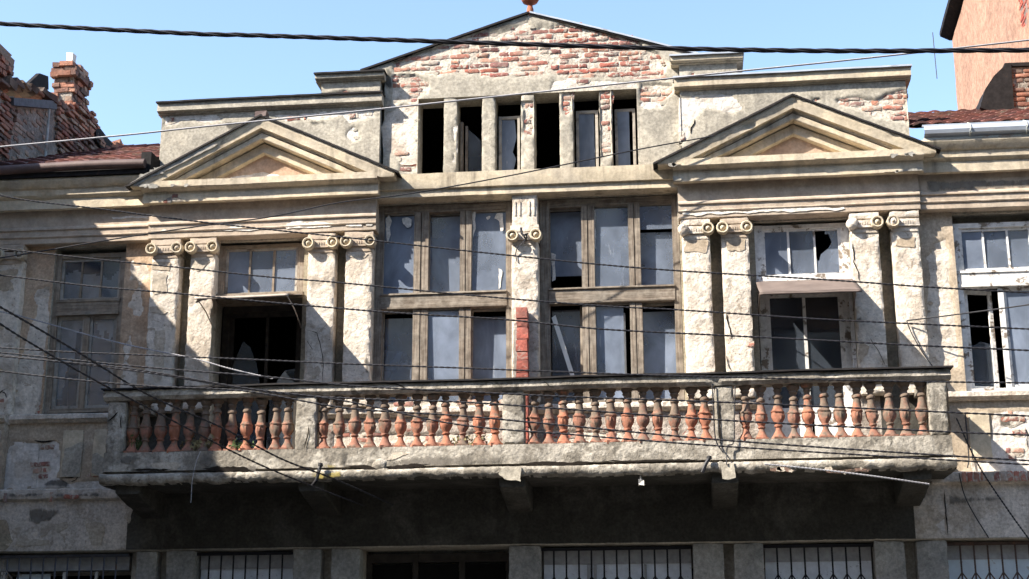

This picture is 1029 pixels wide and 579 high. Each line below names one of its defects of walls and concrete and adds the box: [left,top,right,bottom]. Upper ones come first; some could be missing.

flaking render [1018,0,1029,28]
flaking render [276,22,742,172]
flaking render [838,89,910,126]
peeling [128,261,171,316]
peeling [4,441,106,499]
peeling [946,411,1029,483]